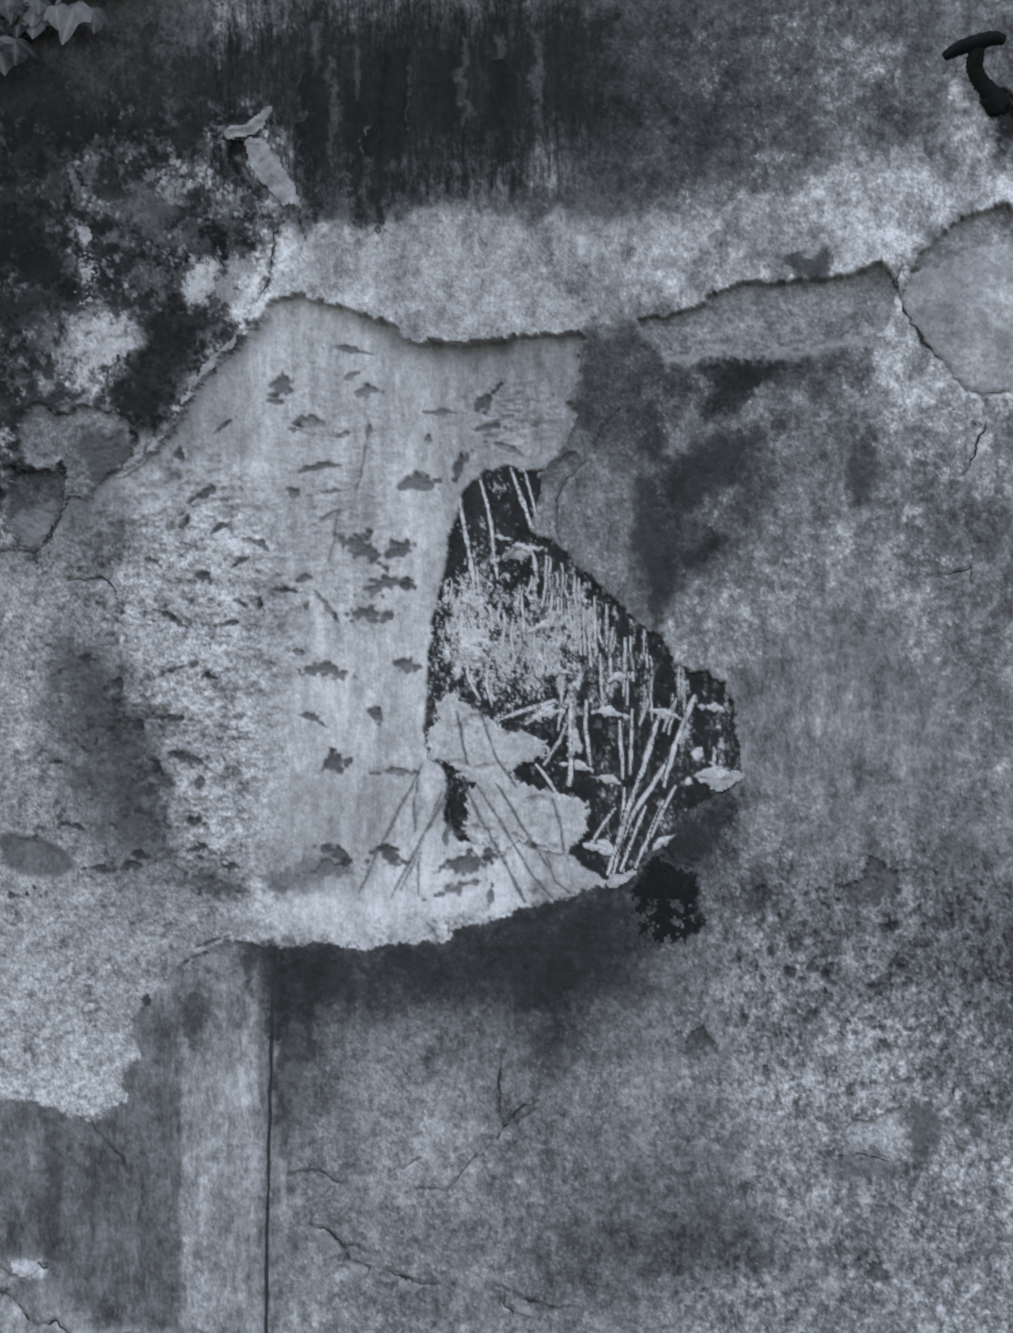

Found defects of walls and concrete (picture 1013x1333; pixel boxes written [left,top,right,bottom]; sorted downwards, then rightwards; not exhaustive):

water stain [99,0,646,238]
crack [249,210,284,304]
crack [887,261,1012,475]
crack [555,408,621,543]
water stain [631,355,786,614]
water stain [845,424,877,507]
flaking render [0,292,746,1123]
crack [402,1055,532,1197]
crack [0,1261,69,1333]
crack [316,1227,436,1285]
crack [503,1287,570,1331]